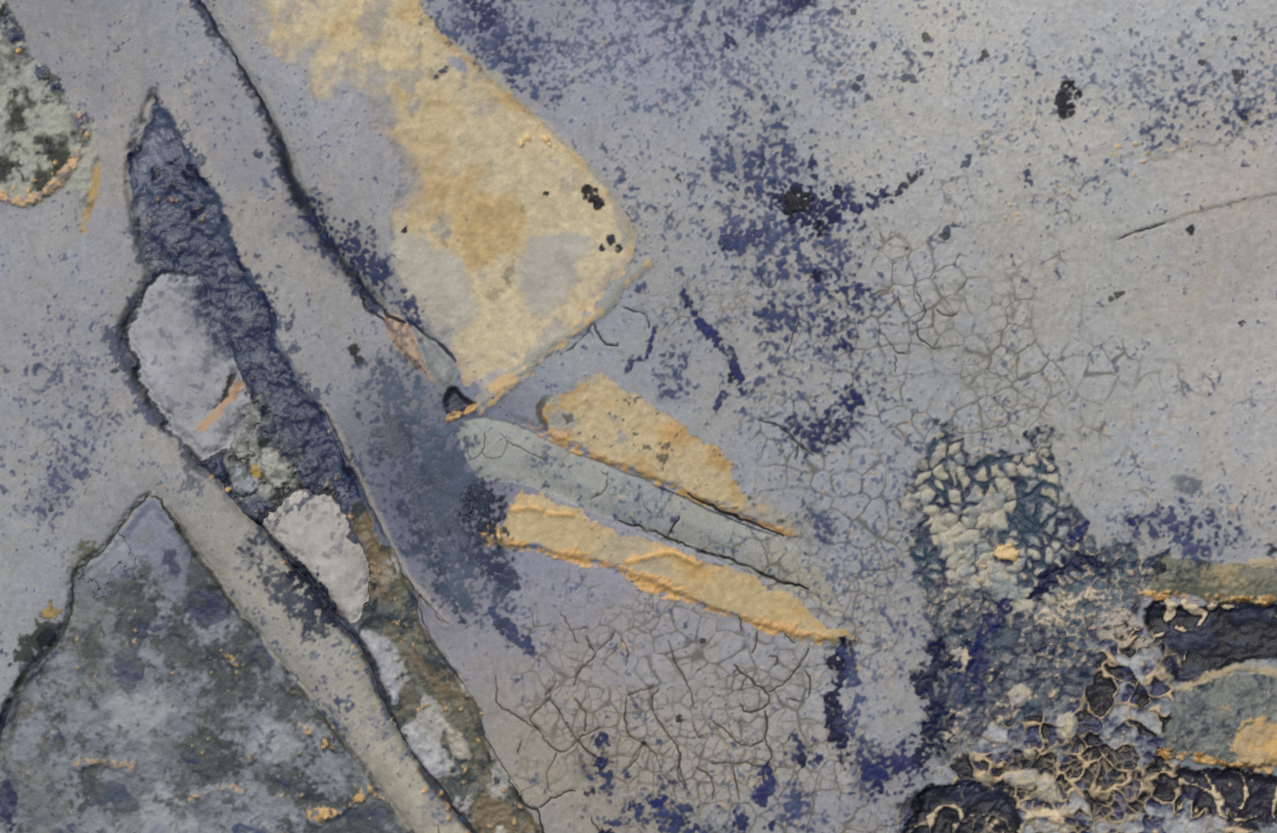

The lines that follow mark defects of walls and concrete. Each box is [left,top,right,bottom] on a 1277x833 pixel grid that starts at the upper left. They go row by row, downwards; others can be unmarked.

spalling [0,0,101,215]
crack [568,324,618,350]
crack [865,289,956,366]
spalling [111,92,546,833]
crack [473,434,541,459]
crack [759,419,813,458]
crack [618,493,809,589]
spalling [0,497,411,833]
crack [483,615,811,833]